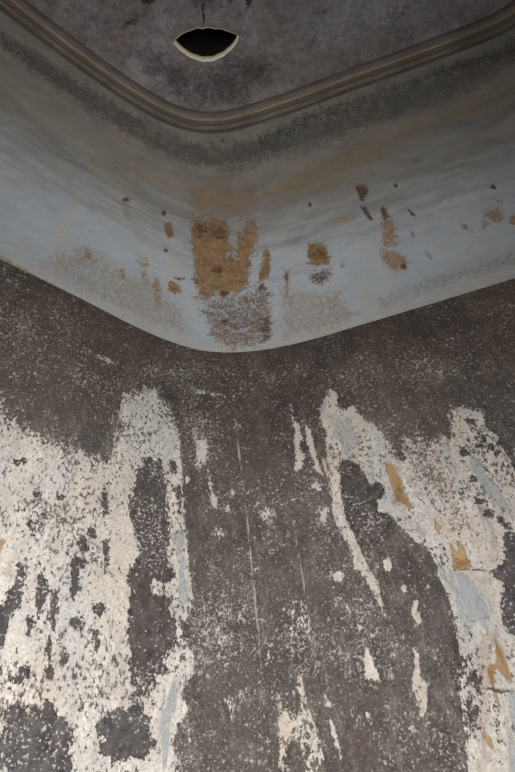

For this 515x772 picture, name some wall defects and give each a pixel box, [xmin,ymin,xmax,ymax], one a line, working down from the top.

rust [138,193,275,351]
rust [306,238,334,285]
rust [356,184,410,272]
peeling [0,385,251,772]
peeling [250,503,282,527]
peeling [285,388,515,772]